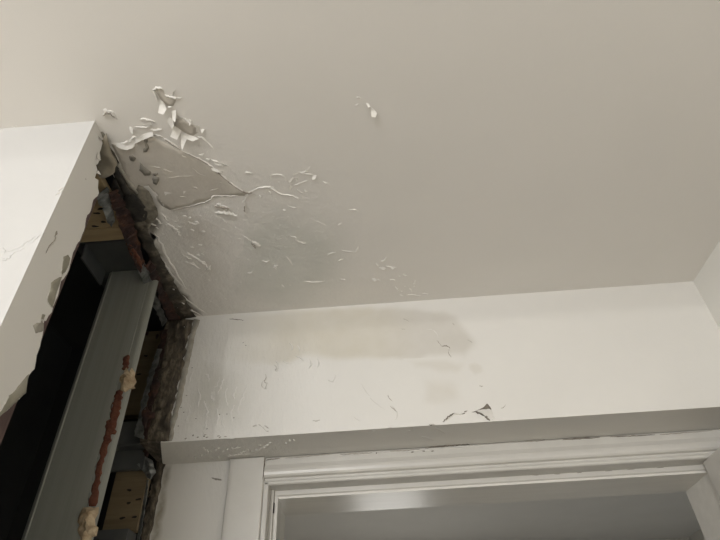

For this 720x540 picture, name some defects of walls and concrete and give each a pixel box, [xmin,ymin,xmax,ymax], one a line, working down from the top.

crack [242,186,299,217]
spalling [46,255,70,308]
peeling [110,86,247,540]
leakage [111,178,484,439]
rust [89,389,123,506]